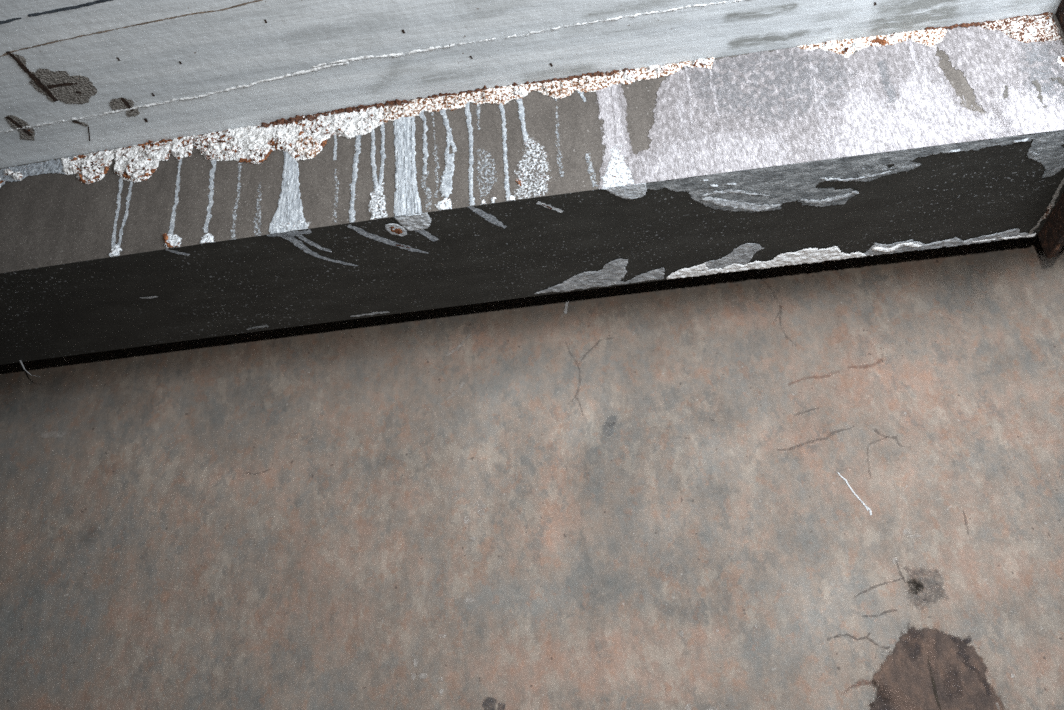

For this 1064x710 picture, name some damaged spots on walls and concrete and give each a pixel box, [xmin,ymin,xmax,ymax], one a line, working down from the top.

crack [0,0,262,57]
spalling [6,51,97,104]
spalling [5,115,35,141]
spalling [110,97,148,122]
leakage [0,12,1064,314]
leakage [870,627,1004,710]